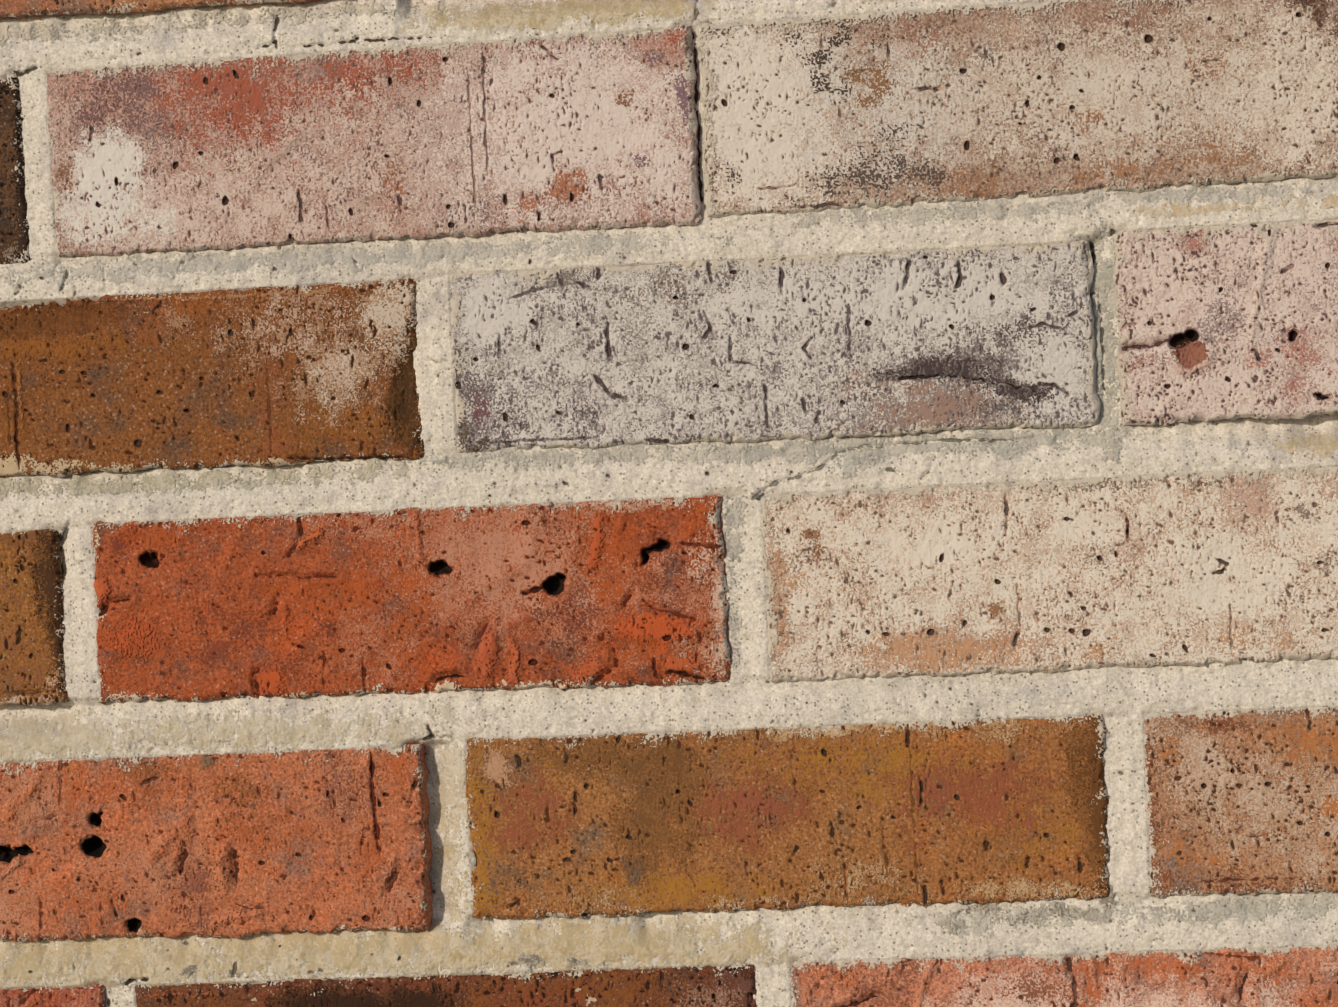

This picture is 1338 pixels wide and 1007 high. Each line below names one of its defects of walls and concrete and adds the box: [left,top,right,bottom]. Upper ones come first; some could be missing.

crack [954,262,962,288]
crack [1022,229,1169,391]
crack [703,321,768,428]
crack [878,374,1067,394]
crack [751,438,1018,500]